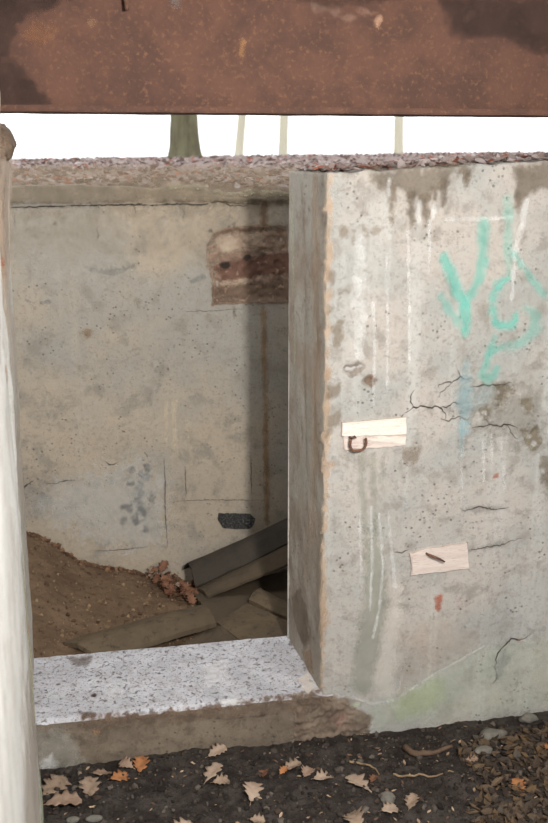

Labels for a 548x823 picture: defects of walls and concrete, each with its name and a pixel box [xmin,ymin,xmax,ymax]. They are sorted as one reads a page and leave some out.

corrosion [0,0,59,105]
corrosion [441,0,548,52]
water stain [373,165,471,223]
water stain [515,163,548,205]
spalling [206,223,289,306]
crack [401,371,518,439]
crack [493,637,527,684]